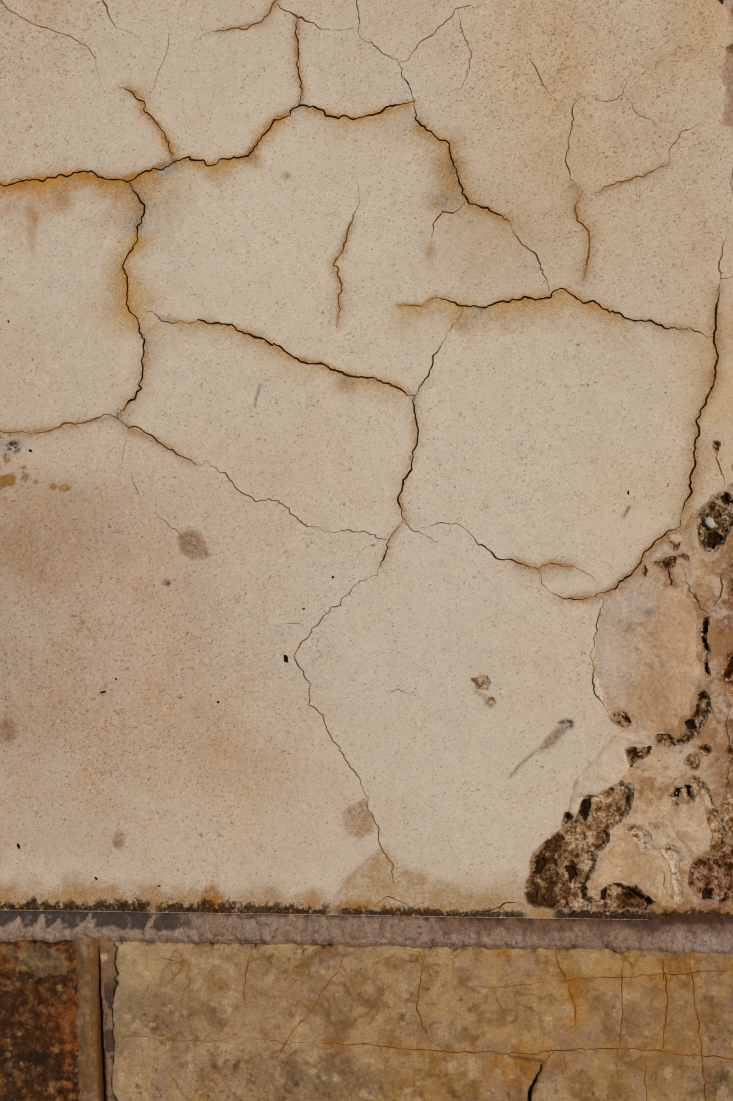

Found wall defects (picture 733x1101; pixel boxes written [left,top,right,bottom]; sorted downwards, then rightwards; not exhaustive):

corrosion [131,90,289,174]
corrosion [0,163,161,202]
crack [0,0,730,884]
spalling [642,492,733,576]
spalling [524,615,733,912]
crack [724,708,732,793]
crack [469,902,523,912]
crack [112,949,733,1101]